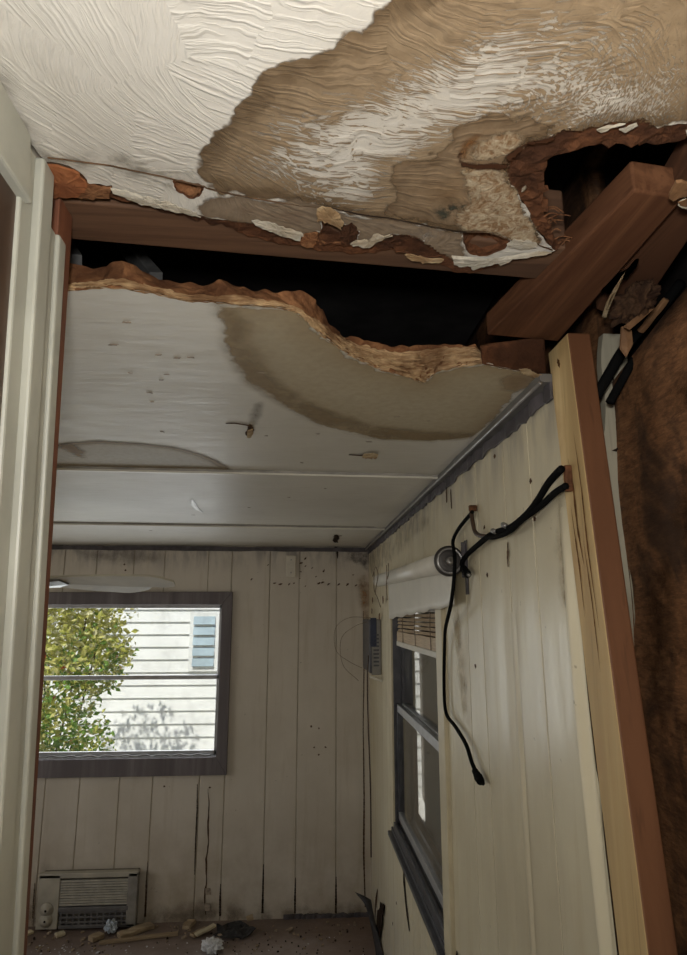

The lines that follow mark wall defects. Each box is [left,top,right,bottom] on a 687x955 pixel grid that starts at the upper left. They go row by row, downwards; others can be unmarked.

damp [197,0,687,261]
peeling [597,123,638,133]
peeling [111,188,201,218]
peeling [252,206,393,248]
peeling [405,239,552,270]
damp [219,307,534,441]
peeling [519,368,542,378]
damp [57,441,228,470]